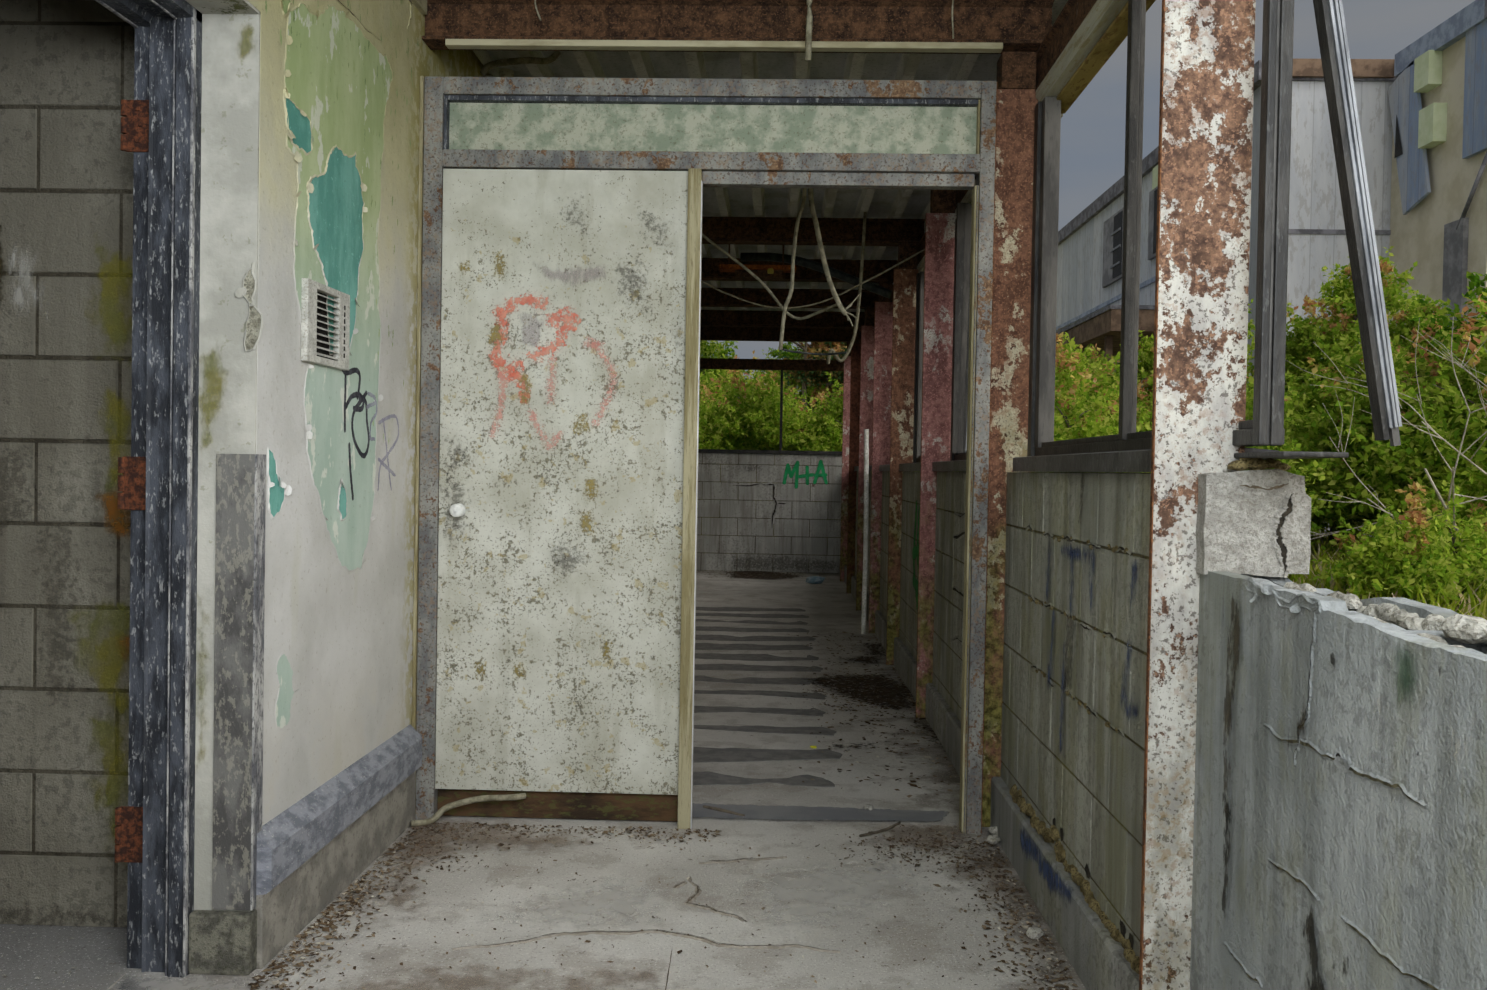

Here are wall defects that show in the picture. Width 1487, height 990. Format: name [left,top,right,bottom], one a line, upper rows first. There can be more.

peeling [235,261,263,352]
peeling [265,0,413,573]
crack [1239,482,1297,578]
spalling [1242,577,1487,648]
crack [1263,613,1426,809]
crack [452,856,840,953]
crack [1224,941,1263,988]
crack [1267,858,1445,990]